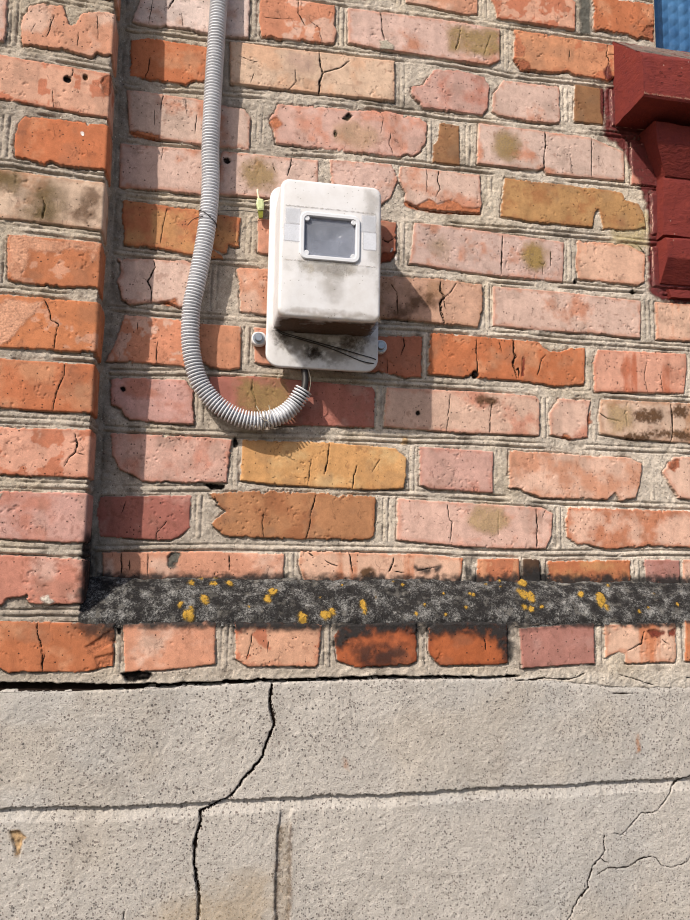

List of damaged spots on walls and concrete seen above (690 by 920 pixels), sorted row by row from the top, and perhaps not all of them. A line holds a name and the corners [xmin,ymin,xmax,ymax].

crack [267,2,349,94]
crack [439,282,456,323]
crack [499,341,544,379]
crack [0,622,585,920]
crack [567,775,690,920]